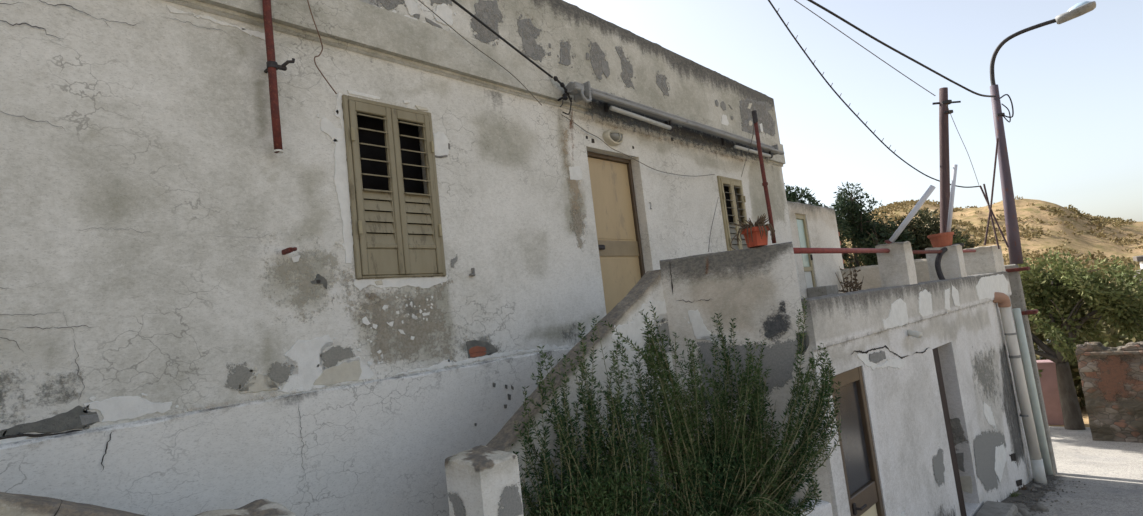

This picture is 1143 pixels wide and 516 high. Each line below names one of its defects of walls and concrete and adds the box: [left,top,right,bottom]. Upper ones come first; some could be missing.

crack [0,1,143,70]
peeling [359,0,456,31]
flaking render [471,0,505,46]
flaking render [517,14,636,89]
flaking render [715,98,776,138]
crack [0,283,92,400]
peeling [225,335,374,394]
water stain [266,251,498,366]
peeling [611,299,671,363]
crack [851,345,928,359]
flaking render [0,393,179,444]
flaking render [933,402,1016,493]